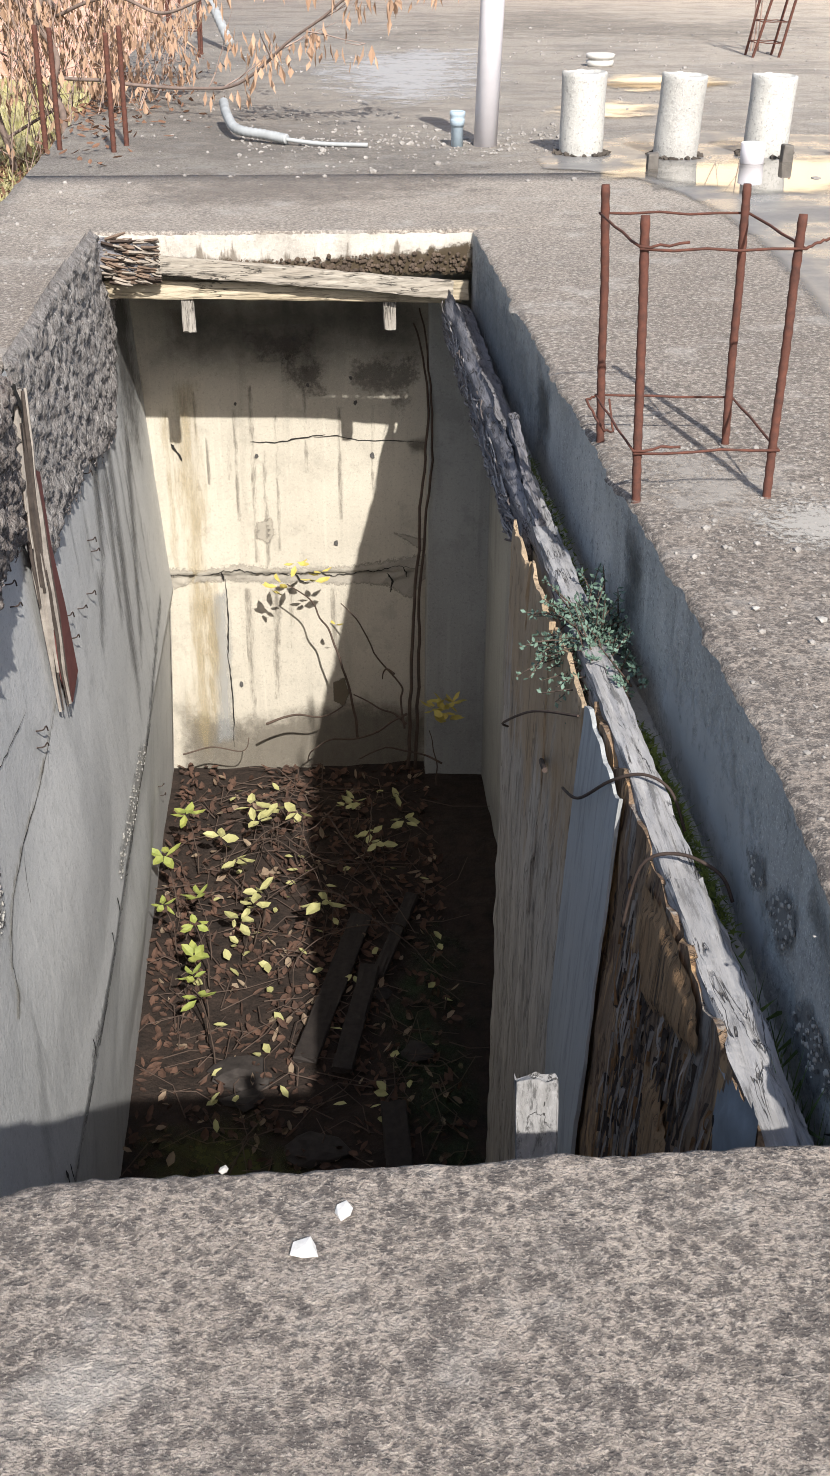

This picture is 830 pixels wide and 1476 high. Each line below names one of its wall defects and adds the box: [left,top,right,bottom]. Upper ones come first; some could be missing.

peeling [0,229,119,611]
crack [252,434,413,443]
crack [0,700,57,1019]
crack [85,805,138,1120]
crack [143,555,426,770]
water stain [188,704,424,769]